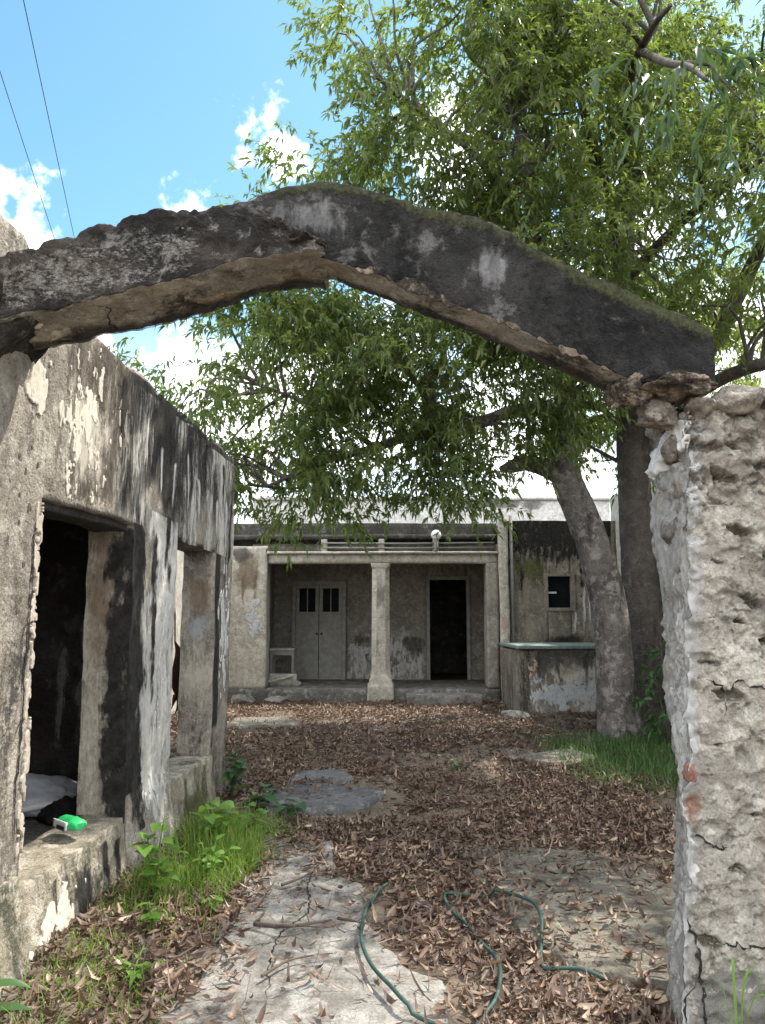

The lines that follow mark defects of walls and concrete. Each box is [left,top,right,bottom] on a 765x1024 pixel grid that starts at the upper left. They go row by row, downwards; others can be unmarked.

spalling [342,263,373,275]
spalling [386,275,472,312]
spalling [537,336,588,360]
peeling [24,323,129,504]
peeling [645,420,735,553]
leakage [30,279,607,839]
peeling [528,659,597,711]
crack [706,679,765,715]
corrosion [685,795,701,822]
peeling [29,878,86,961]
crack [246,870,359,1002]
crack [683,918,765,1024]